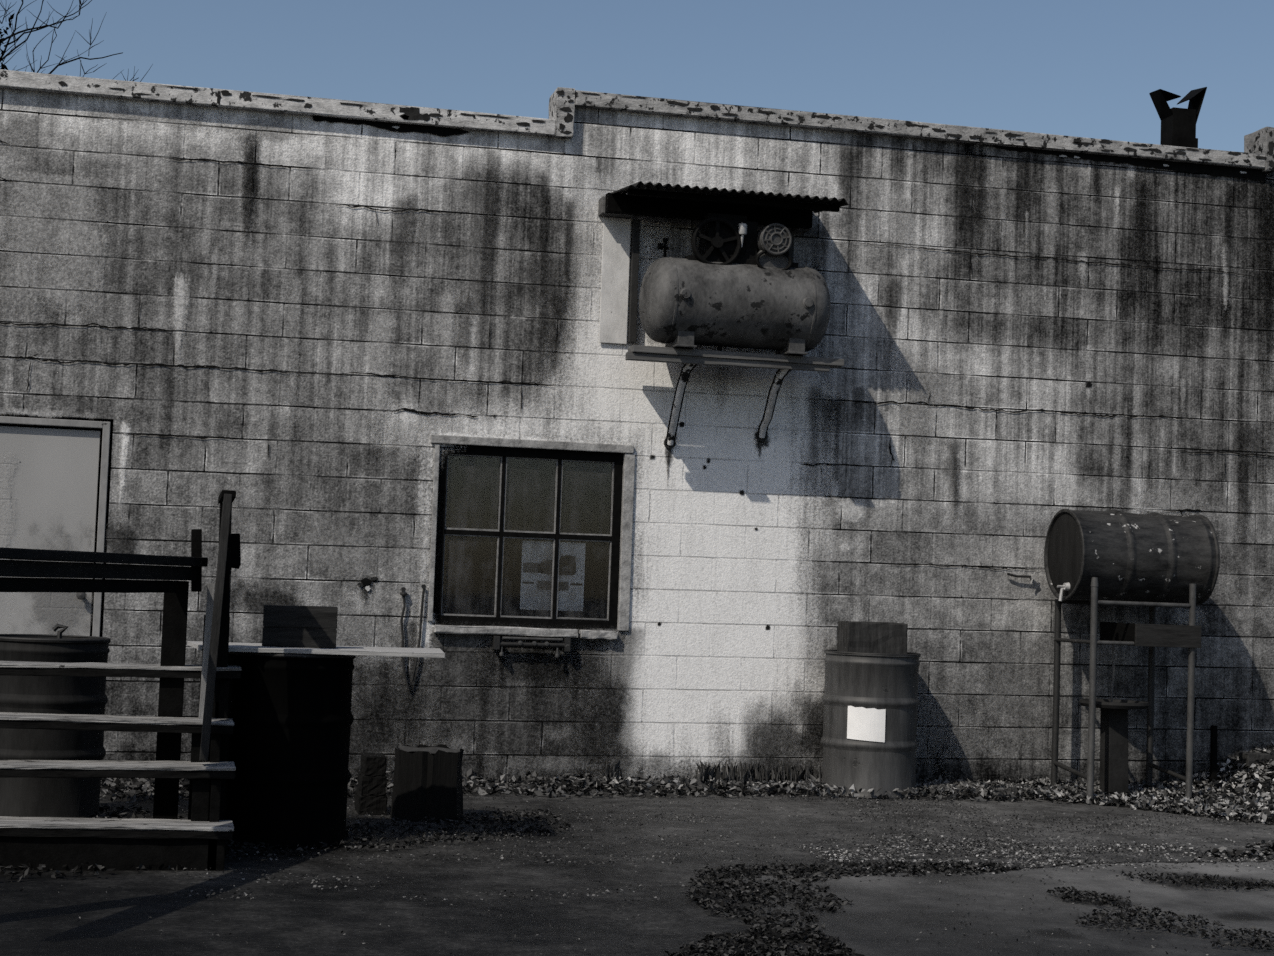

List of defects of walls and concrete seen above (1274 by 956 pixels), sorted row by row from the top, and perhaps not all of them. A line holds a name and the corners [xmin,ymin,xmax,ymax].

water stain [220,120,292,236]
peeling [252,95,312,108]
spalling [392,107,443,129]
spalling [460,90,600,134]
peeling [667,101,738,116]
peeling [906,124,1025,140]
peeling [1060,139,1211,166]
water stain [528,177,572,352]
water stain [1048,182,1059,279]
water stain [1114,166,1151,301]
water stain [1222,189,1235,306]
efflorescence [173,273,189,359]